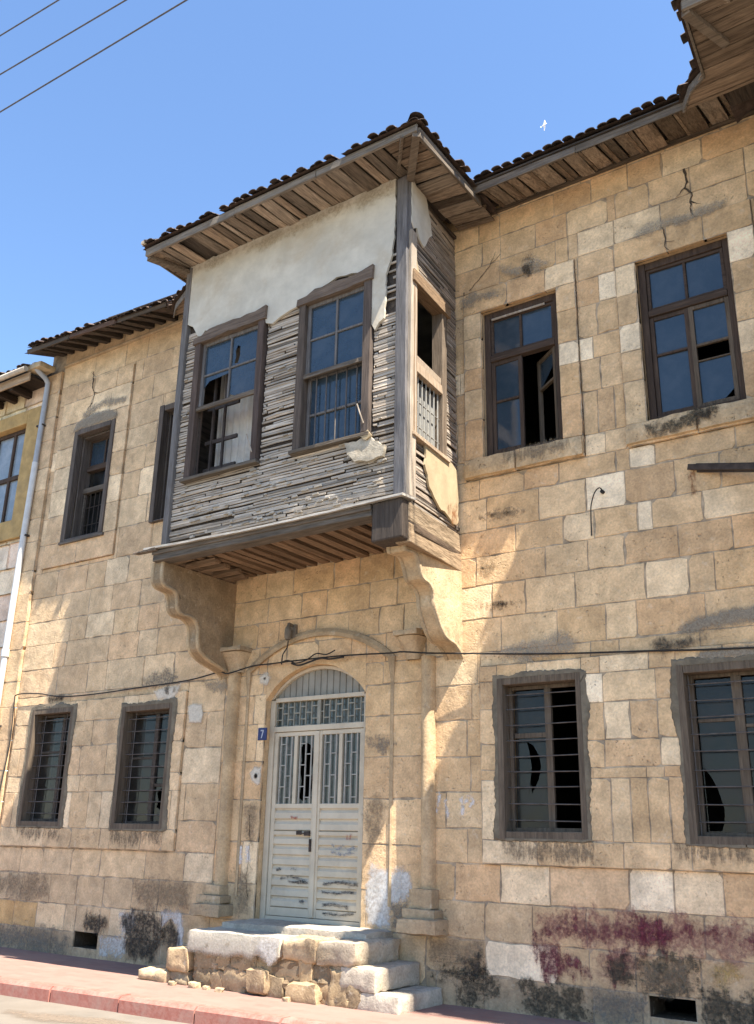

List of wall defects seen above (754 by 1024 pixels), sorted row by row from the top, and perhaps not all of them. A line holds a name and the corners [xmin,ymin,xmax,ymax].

crack [676,168,696,215]
damp [644,405,718,437]
peeling [344,430,387,463]
damp [504,841,594,861]
damp [391,904,406,928]
damp [631,915,740,999]